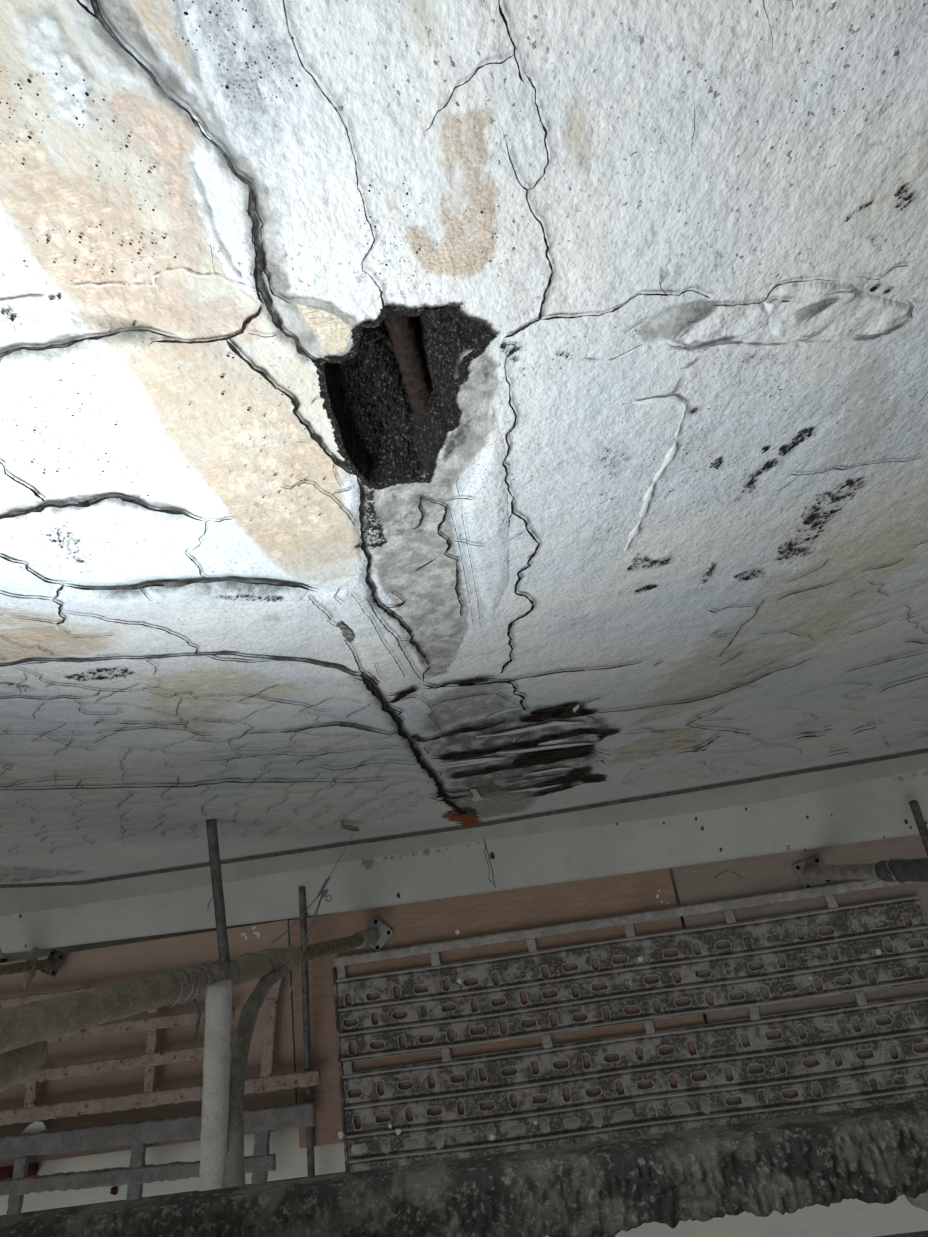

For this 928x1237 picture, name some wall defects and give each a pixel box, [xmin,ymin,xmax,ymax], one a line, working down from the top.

water stain [405,111,497,279]
water stain [0,0,387,581]
spalling [296,304,497,490]
crack [0,0,928,856]
water stain [734,428,814,501]
water stain [608,477,928,766]
spalling [412,721,504,743]
rust [441,813,482,827]
crack [483,837,495,885]
spalling [432,703,620,797]